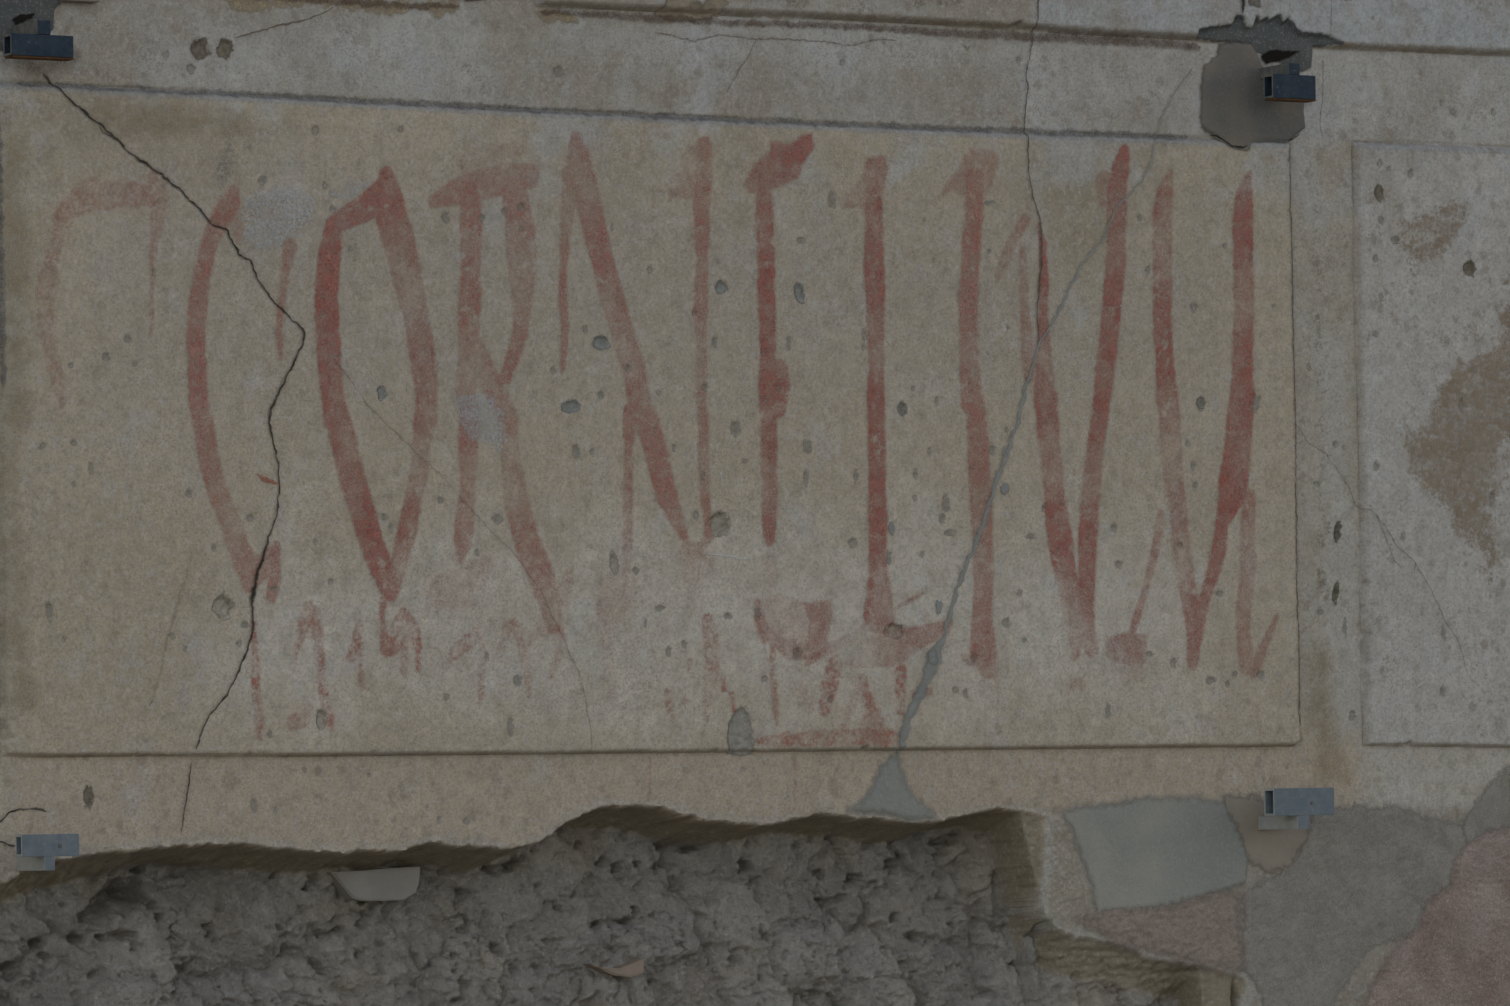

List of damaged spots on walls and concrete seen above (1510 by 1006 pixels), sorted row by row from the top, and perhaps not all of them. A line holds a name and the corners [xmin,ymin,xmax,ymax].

crack [0,808,47,847]
crack [43,73,305,832]
crack [897,0,1192,755]
damp [1405,306,1510,579]